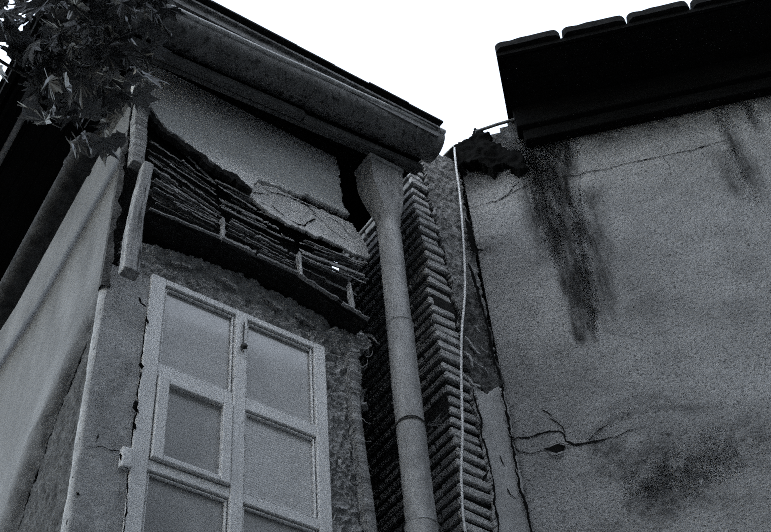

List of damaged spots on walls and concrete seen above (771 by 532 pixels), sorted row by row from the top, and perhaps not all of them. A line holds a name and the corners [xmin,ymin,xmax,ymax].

flaking render [147,110,252,196]
leakage [523,139,604,341]
crack [465,140,725,532]